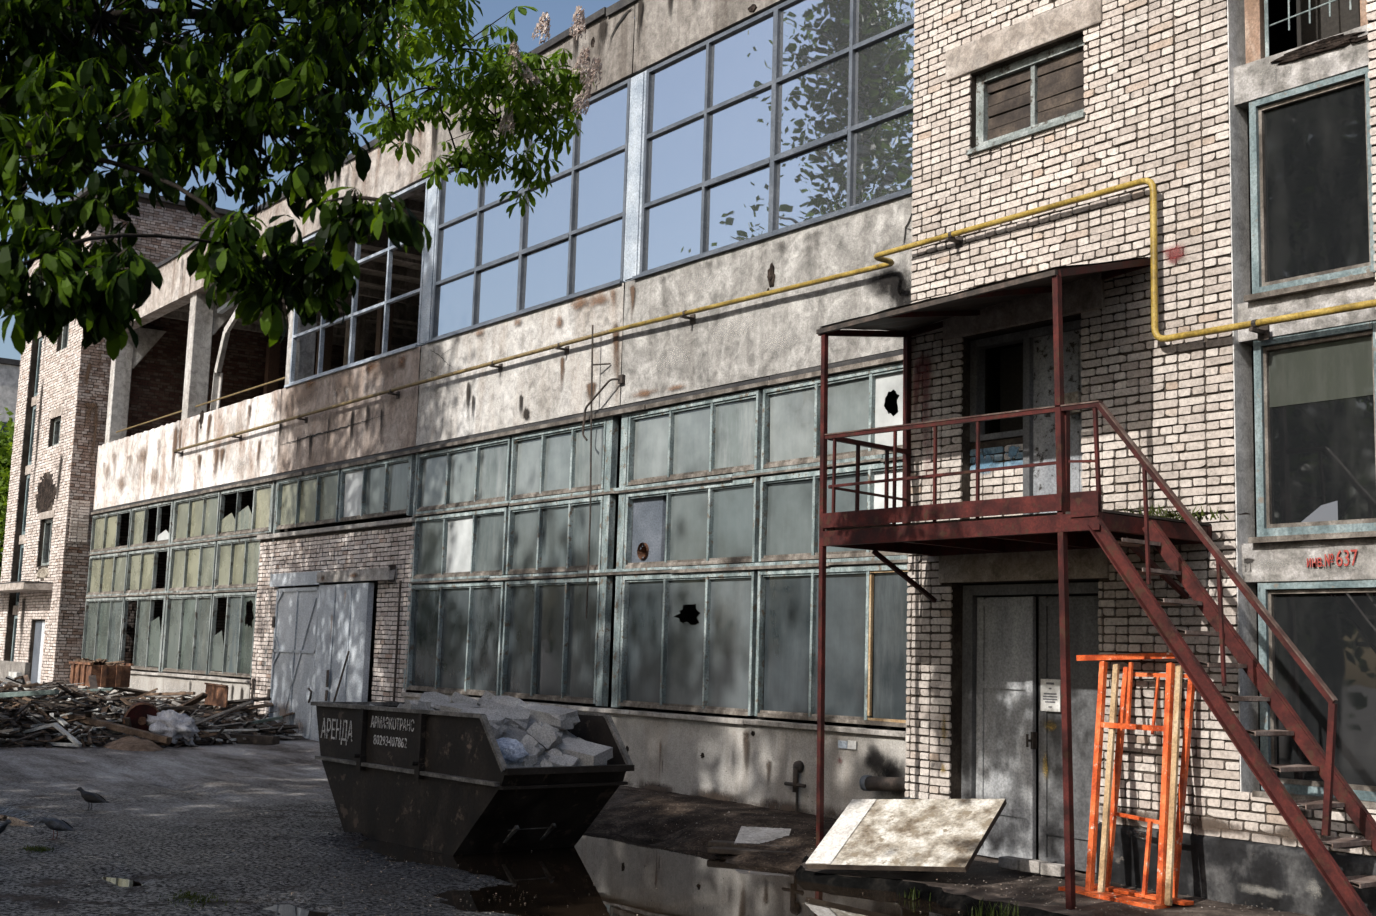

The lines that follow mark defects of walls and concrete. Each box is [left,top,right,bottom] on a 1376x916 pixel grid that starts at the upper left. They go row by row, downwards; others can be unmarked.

leakage [598,20,606,53]
leakage [466,382,474,416]
leakage [350,406,383,445]
leakage [104,414,224,488]